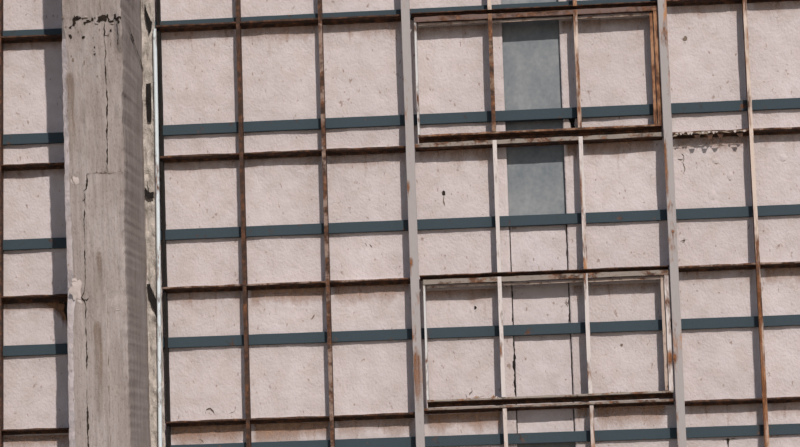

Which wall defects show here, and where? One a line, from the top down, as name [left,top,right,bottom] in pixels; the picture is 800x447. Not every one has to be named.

spalling [62,14,121,55]
crack [59,6,143,368]
crack [87,350,111,447]